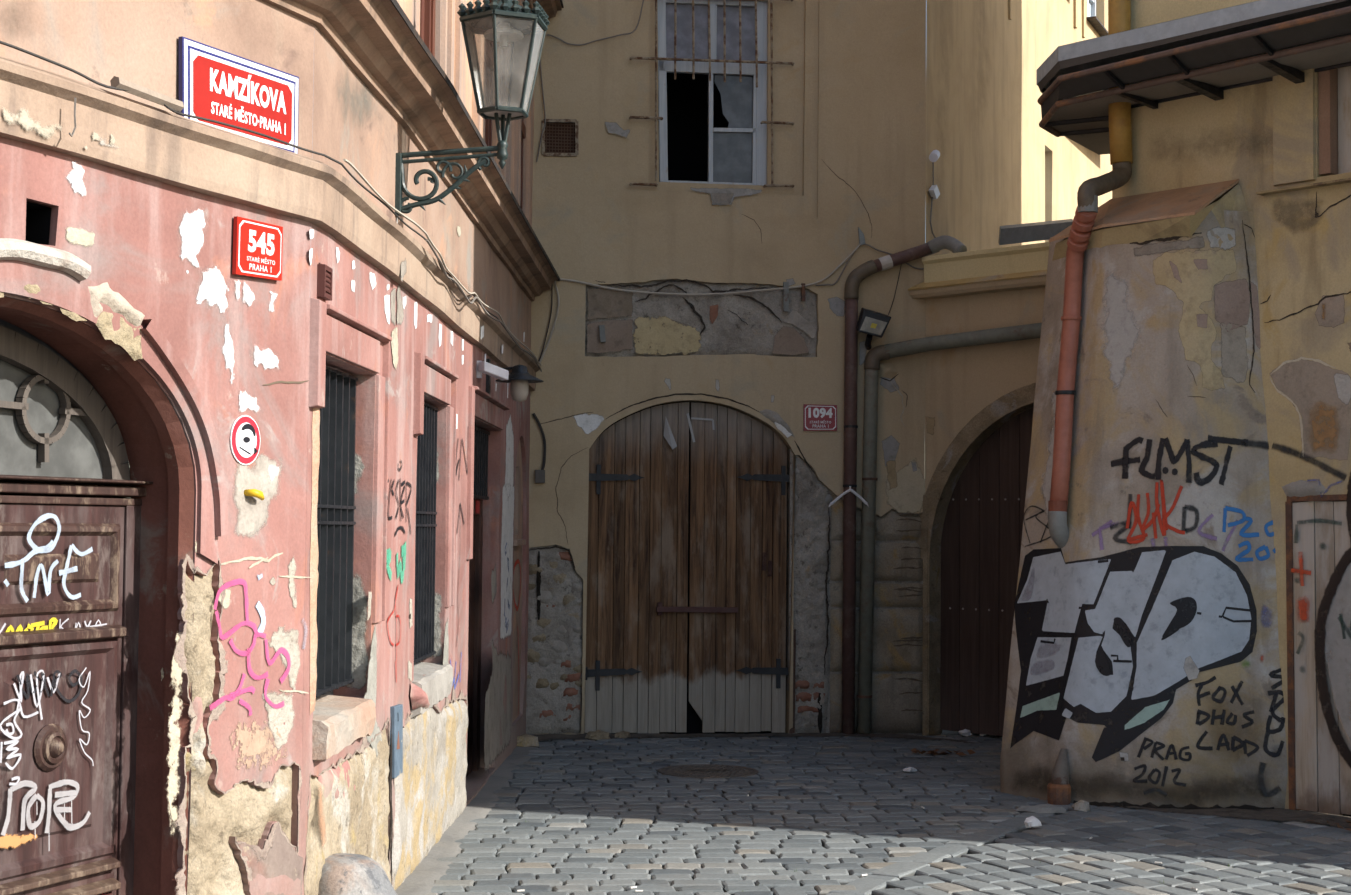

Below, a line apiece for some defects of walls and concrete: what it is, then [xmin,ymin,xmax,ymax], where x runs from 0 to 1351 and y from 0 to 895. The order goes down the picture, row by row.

flaking render [161,408,468,895]